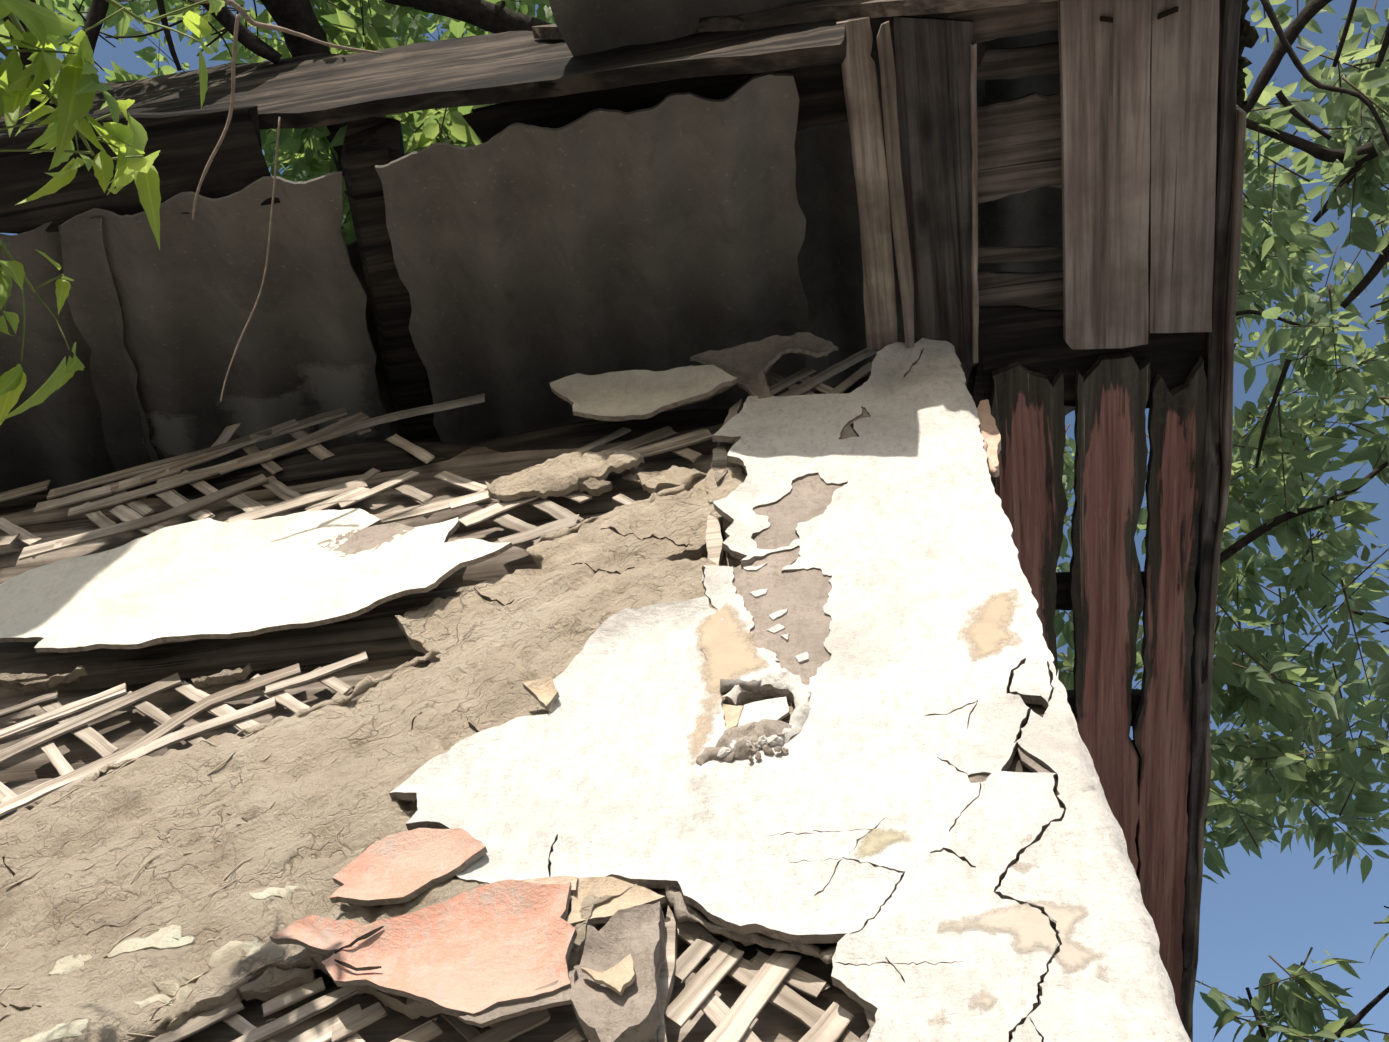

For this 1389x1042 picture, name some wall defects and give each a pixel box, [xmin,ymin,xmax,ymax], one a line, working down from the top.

crack [474,588,514,606]
crack [571,527,712,608]
spalling [0,332,844,1042]
crack [1007,663,1053,740]
spalling [1024,703,1047,718]
crack [995,778,1065,899]
crack [0,1002,41,1010]
spalling [851,1008,876,1042]
crack [1009,912,1061,1042]